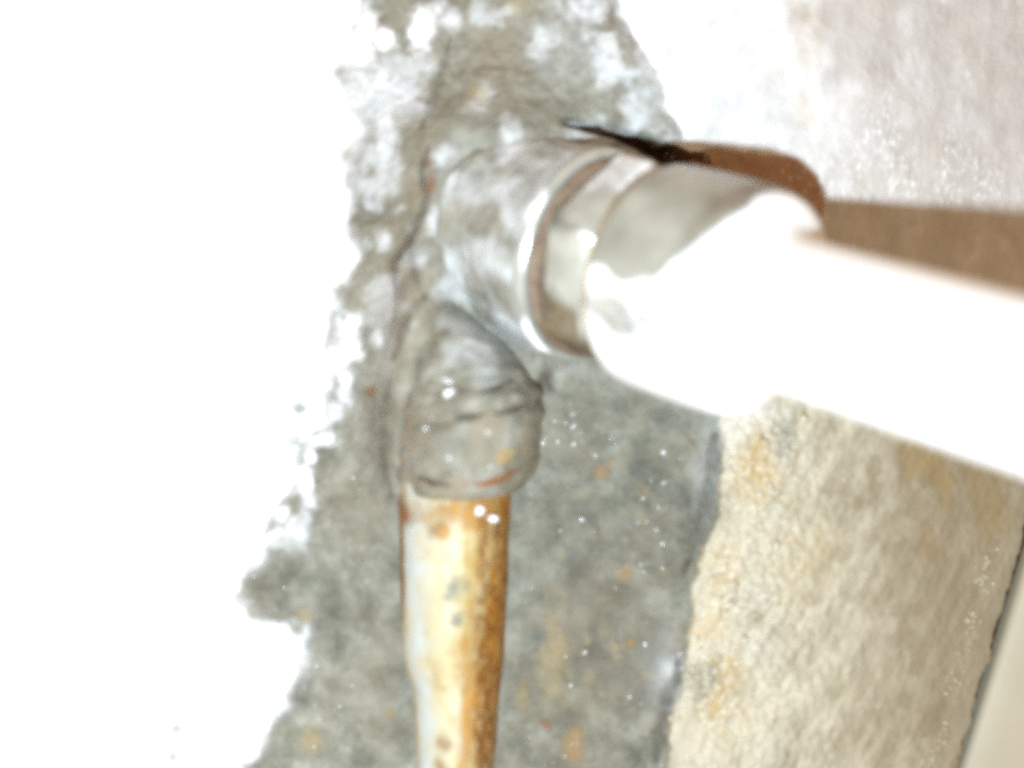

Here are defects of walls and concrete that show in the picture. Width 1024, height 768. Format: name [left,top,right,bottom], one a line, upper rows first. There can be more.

peeling [339,9,409,154]
peeling [407,3,460,52]
peeling [572,0,606,22]
peeling [321,297,364,420]
peeling [248,433,334,565]
rust [398,501,408,609]
rust [436,493,510,768]